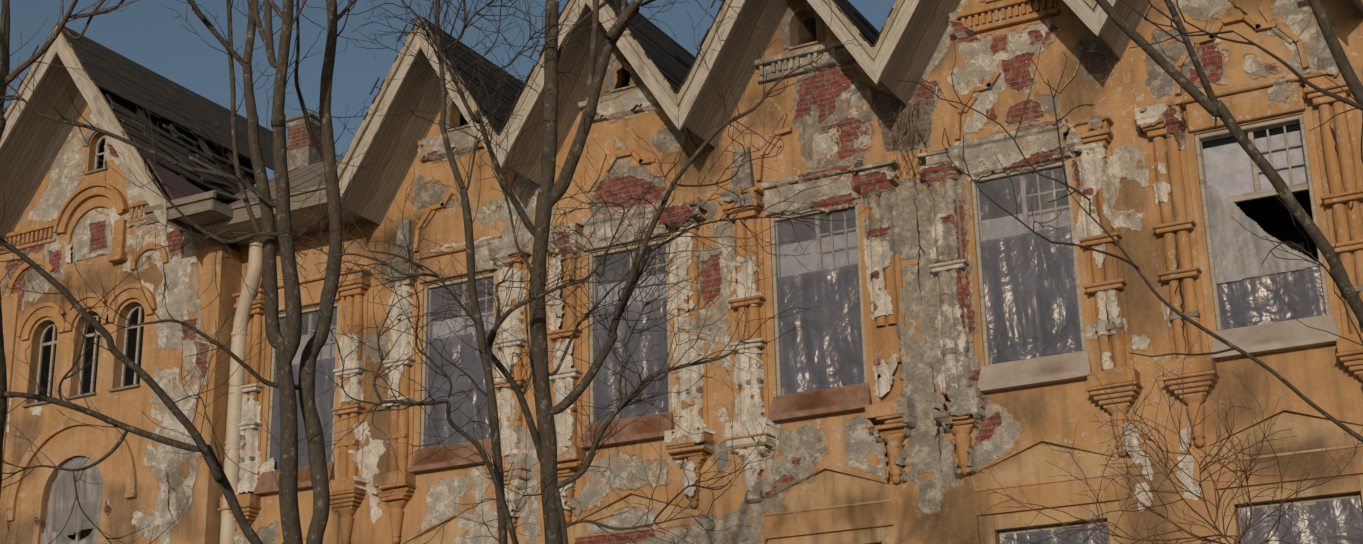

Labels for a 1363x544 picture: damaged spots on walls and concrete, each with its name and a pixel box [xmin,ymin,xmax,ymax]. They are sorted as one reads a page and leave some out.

flaking render [406,0,1340,544]
crack [914,193,924,303]
flaking render [2,112,211,544]
crack [930,360,941,469]
peeling [347,421,391,524]